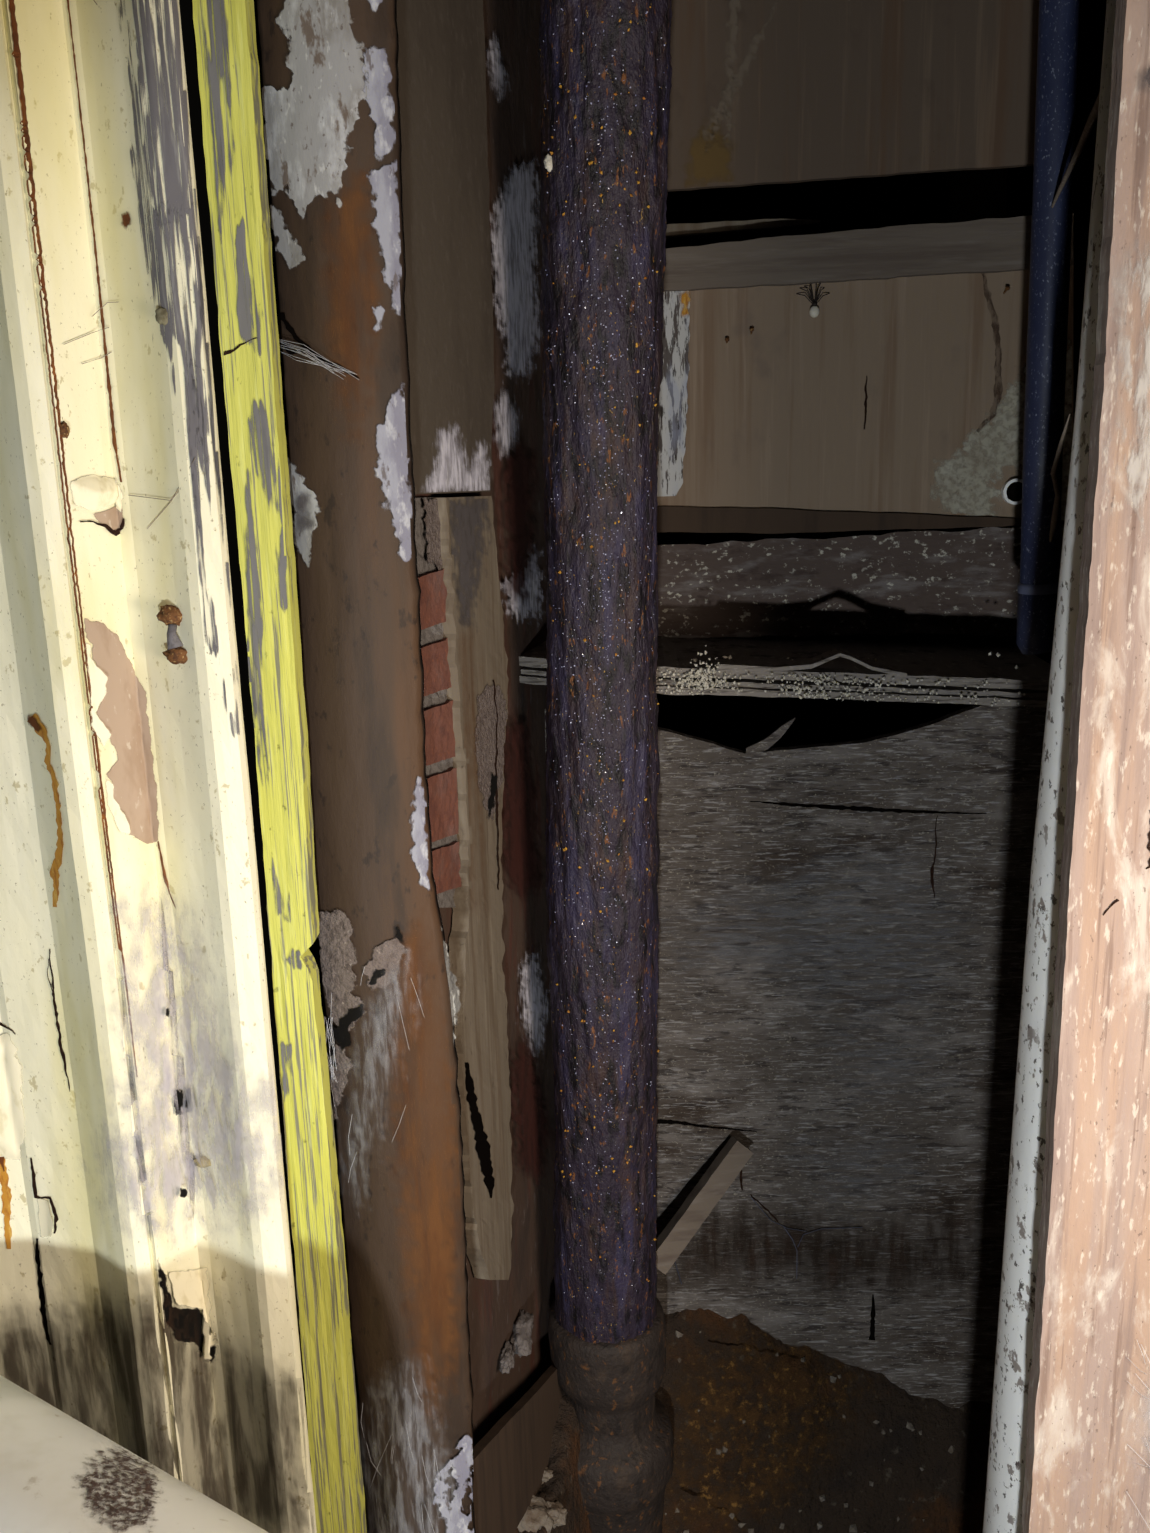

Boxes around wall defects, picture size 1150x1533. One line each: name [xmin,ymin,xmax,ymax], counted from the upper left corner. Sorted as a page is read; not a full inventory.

peeling [262,0,402,331]
peeling [375,388,443,570]
efflorescence [1118,258,1150,522]
peeling [85,618,159,844]
spalling [286,949,302,969]
spalling [318,909,408,1120]
rust [0,1157,12,1249]
peeling [433,1435,474,1533]